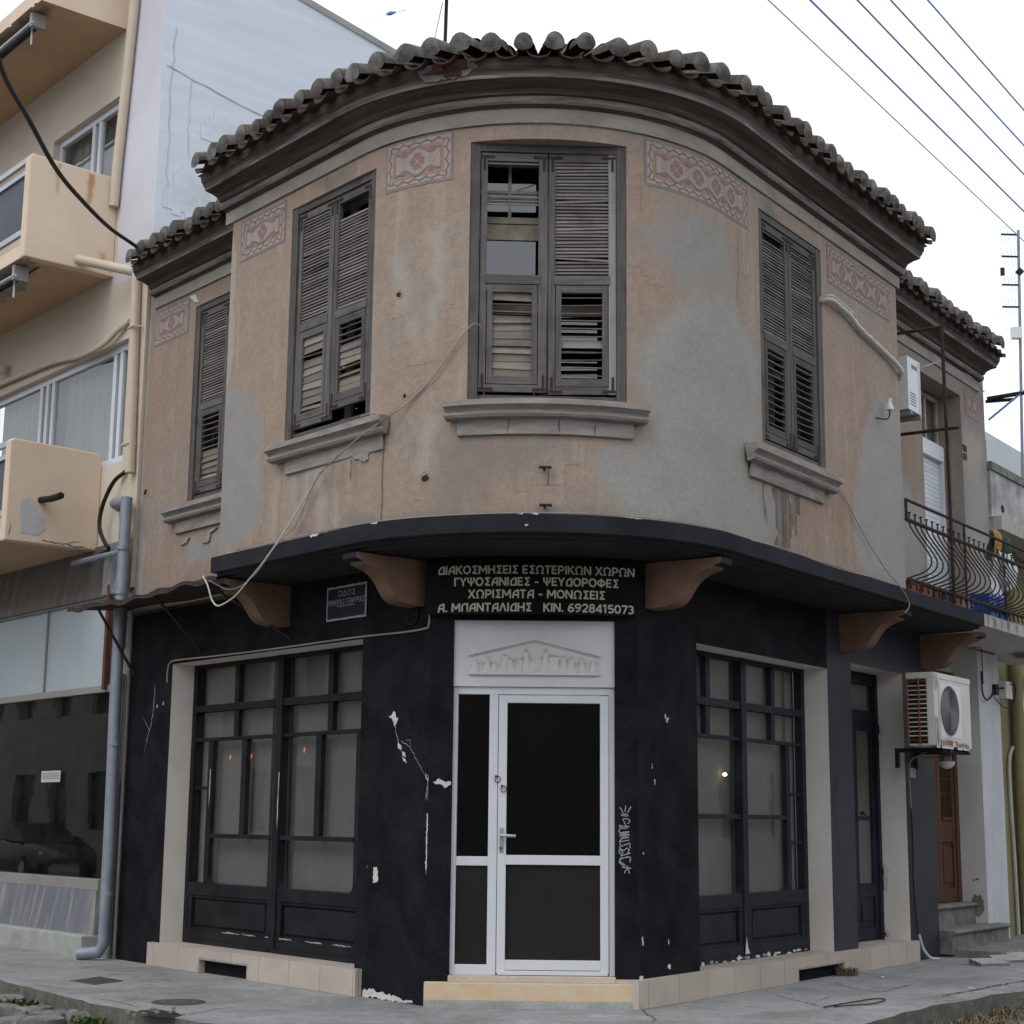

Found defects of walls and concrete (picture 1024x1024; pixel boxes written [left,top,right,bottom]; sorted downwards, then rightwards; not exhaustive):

crack [166,27,263,213]
corrosion [53,162,63,196]
corrosion [84,170,98,207]
water stain [772,486,851,571]
peeling [362,988,413,1004]